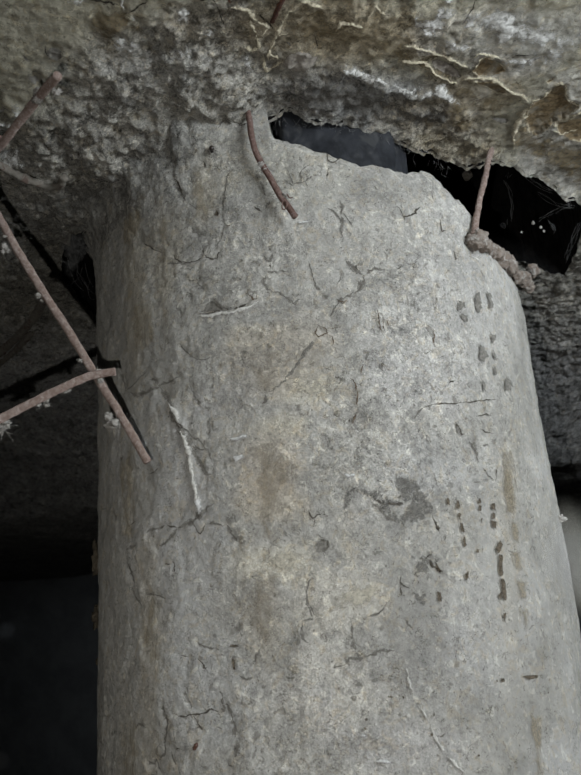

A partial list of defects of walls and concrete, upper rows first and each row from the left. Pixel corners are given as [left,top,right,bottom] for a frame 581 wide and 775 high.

crack [92,0,148,15]
water stain [231,0,581,184]
crack [121,371,212,476]